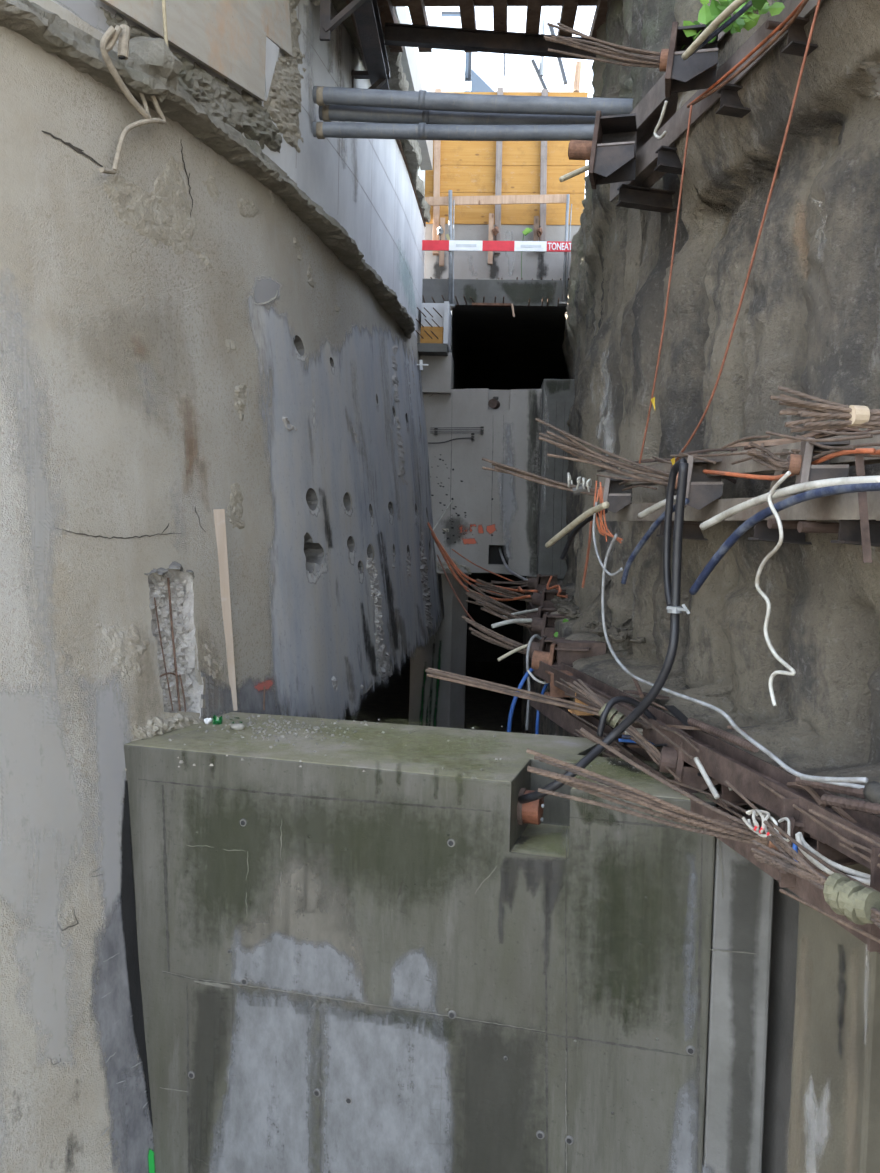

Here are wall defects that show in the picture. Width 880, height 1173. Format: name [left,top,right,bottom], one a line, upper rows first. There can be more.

spalling [57,0,154,39]
spalling [172,0,306,153]
spalling [42,131,103,167]
crack [55,507,204,539]
peeling [129,295,471,740]
damp [319,490,332,547]
damp [361,603,377,676]
damp [379,533,398,649]
damp [190,800,535,1173]
damp [498,858,564,973]
damp [684,872,697,1036]